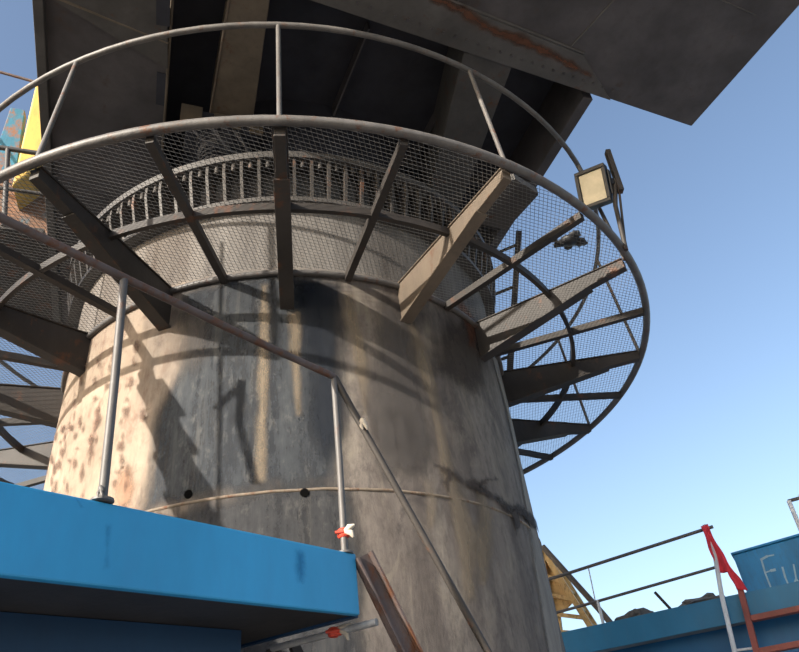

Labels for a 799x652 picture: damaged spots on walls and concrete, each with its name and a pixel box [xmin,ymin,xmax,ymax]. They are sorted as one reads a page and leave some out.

rust [431,0,591,77]
leakage [143,276,362,558]
rust [116,471,133,506]
leakage [241,569,364,652]